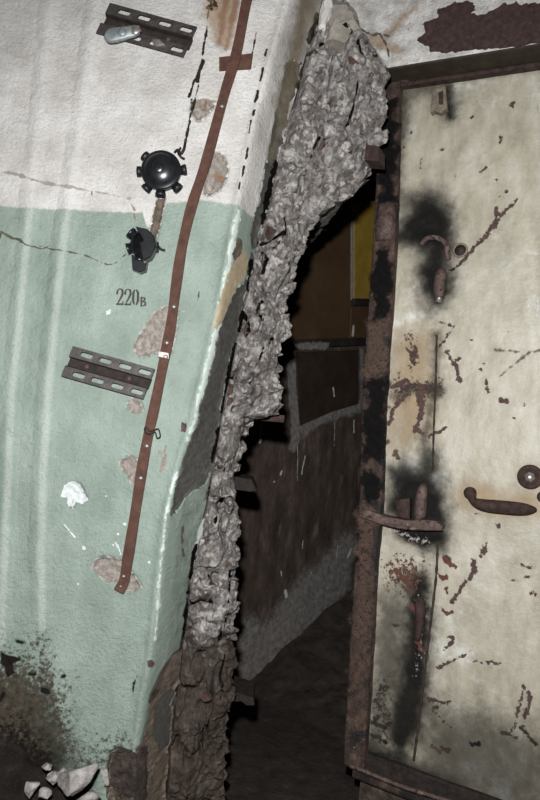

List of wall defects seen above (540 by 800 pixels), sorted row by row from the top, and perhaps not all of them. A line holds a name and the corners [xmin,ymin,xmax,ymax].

peeling [417,0,540,53]
crack [5,171,108,195]
crack [0,231,126,265]
spalling [102,0,391,800]
corrosion [361,316,447,439]
corrosion [438,321,463,383]
spalling [61,481,88,509]
spalling [92,522,142,593]
corrosion [437,541,488,616]
corrosion [348,506,430,751]
leakage [0,630,129,773]
corrosion [506,684,533,739]